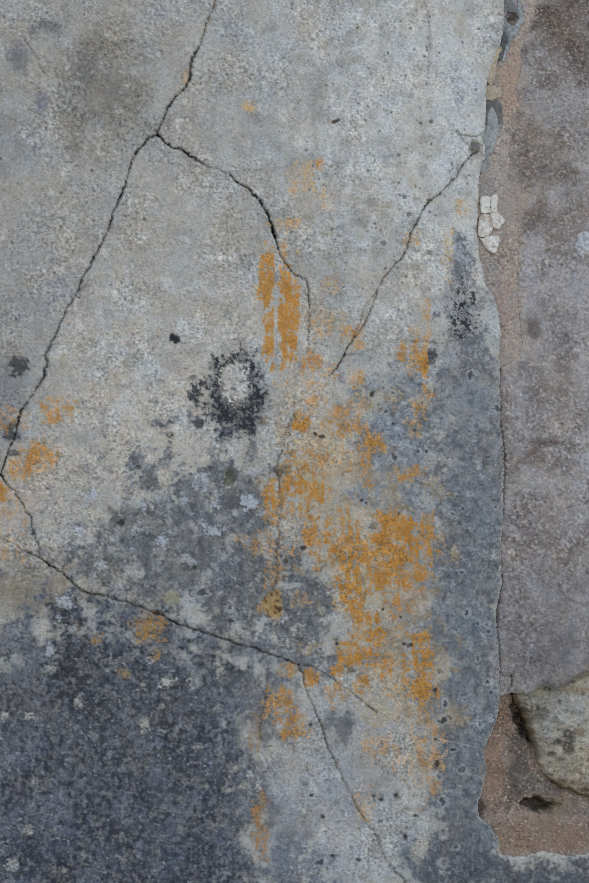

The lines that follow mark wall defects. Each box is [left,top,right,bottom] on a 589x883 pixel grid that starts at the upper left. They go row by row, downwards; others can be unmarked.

crack [0,0,479,549]
crack [273,414,297,592]
crack [499,406,507,515]
water stain [0,333,359,883]
crack [0,539,480,883]
crack [497,561,514,687]
spalling [477,692,589,856]